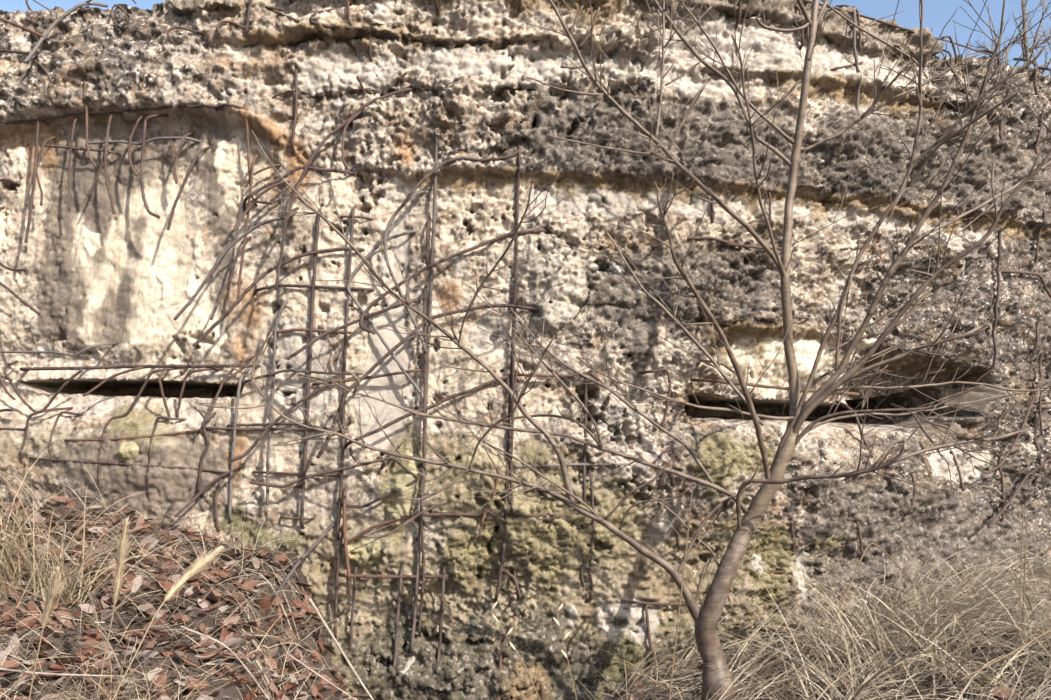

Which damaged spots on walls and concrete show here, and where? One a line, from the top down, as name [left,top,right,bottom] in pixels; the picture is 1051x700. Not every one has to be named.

spalling [291,4,948,133]
rust [0,122,58,182]
flaking render [213,134,249,215]
rust [233,111,312,192]
flaking render [7,124,230,357]
damp [37,110,233,348]
rust [225,281,262,364]
flaking render [267,315,339,421]
flaking render [352,212,416,458]
rust [228,427,247,488]
damp [703,460,733,505]
damp [340,531,632,700]